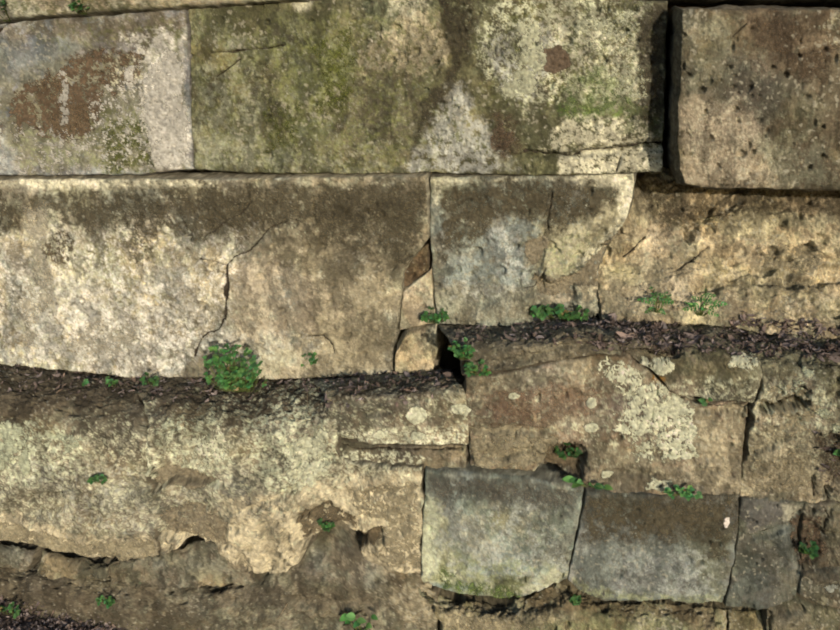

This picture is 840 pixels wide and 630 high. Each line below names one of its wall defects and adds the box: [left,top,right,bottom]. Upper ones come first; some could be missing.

crack [194,219,297,356]